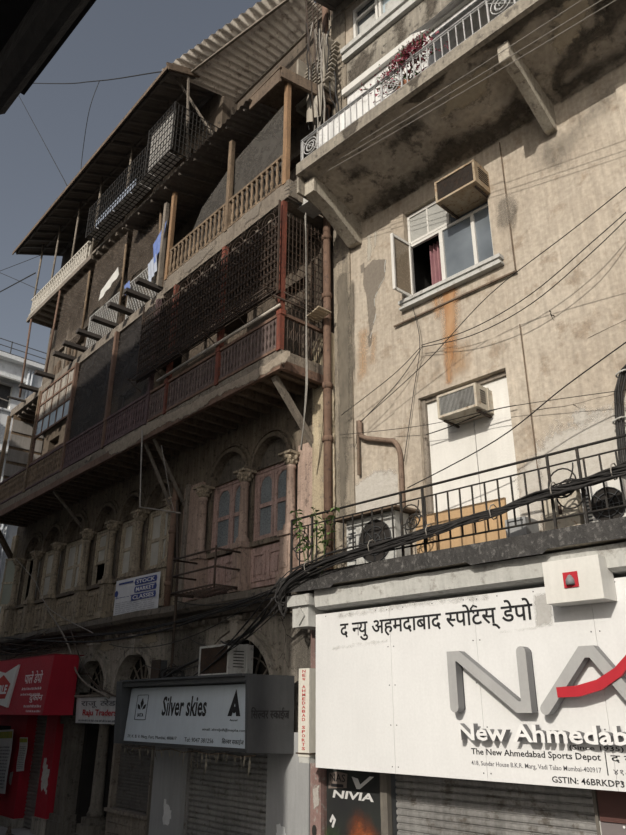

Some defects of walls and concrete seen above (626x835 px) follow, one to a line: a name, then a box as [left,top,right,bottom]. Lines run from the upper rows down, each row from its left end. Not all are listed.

leakage [553,0,626,99]
leakage [342,120,358,139]
leakage [364,97,532,216]
leakage [499,197,517,225]
corrosion [434,288,455,382]